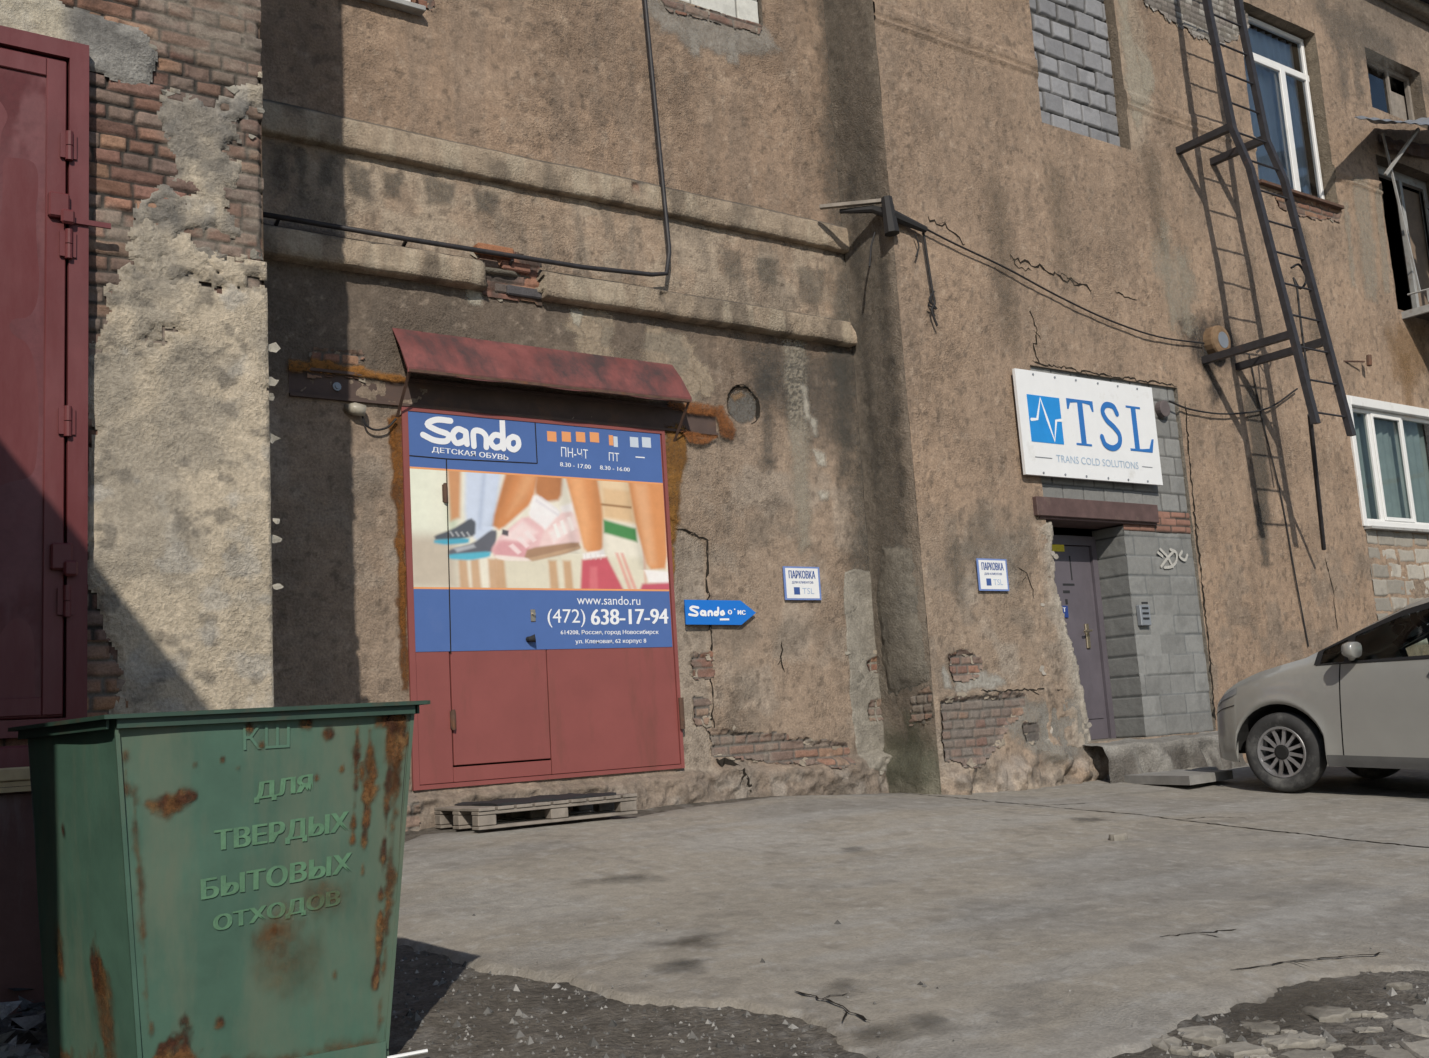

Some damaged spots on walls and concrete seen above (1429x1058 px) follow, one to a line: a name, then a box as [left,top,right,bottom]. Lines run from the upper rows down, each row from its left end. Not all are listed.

flaking render [1144,0,1250,45]
flaking render [1119,0,1154,127]
crack [928,217,965,245]
flaking render [0,0,283,714]
corrosion [289,358,406,382]
damp [1245,387,1269,565]
flaking render [689,651,715,679]
flaking render [909,521,1092,768]
flaking render [692,696,856,769]
flaking render [405,781,421,831]